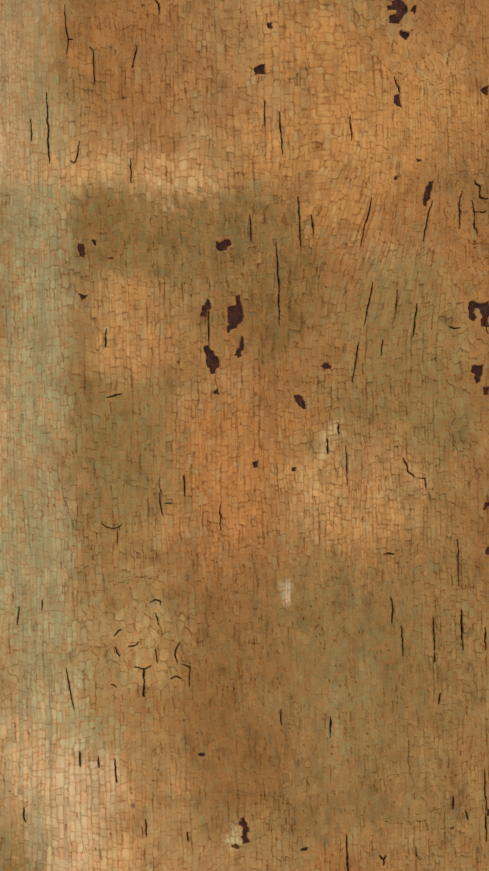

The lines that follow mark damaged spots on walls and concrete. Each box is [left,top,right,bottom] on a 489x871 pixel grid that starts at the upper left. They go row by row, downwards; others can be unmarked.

peeling [387,0,416,40]
crack [30,93,80,164]
crack [263,100,284,155]
peeling [423,181,433,206]
crack [458,180,488,234]
peeling [203,295,244,374]
peeling [468,301,489,334]
peeling [471,365,489,395]
crack [326,423,348,485]
crack [114,629,191,697]
crack [78,751,118,783]
peeling [232,813,251,849]